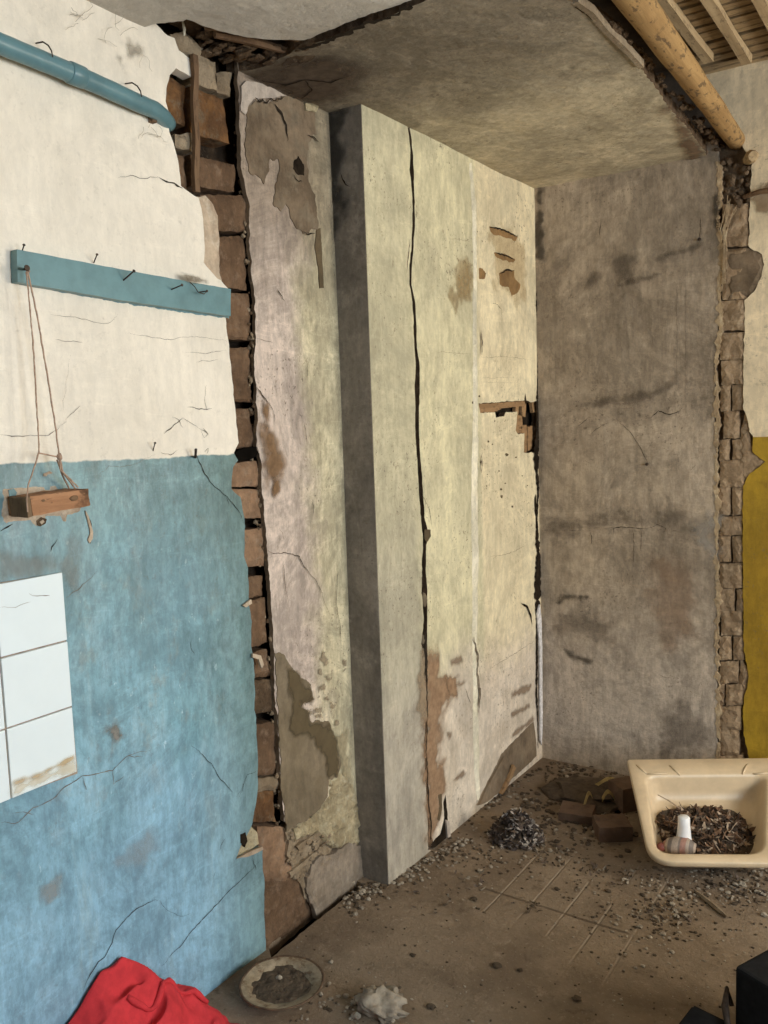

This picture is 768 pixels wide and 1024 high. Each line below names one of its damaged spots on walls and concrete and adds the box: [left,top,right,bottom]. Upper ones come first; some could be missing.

flaking render [489,226,518,241]
flaking render [494,252,520,295]
crack [107,389,243,521]
flaking render [157,23,360,957]
crack [422,501,432,543]
flaking render [704,135,765,759]
crack [420,592,428,607]
crack [421,632,432,845]
flaking render [428,794,451,848]
crack [83,839,256,990]